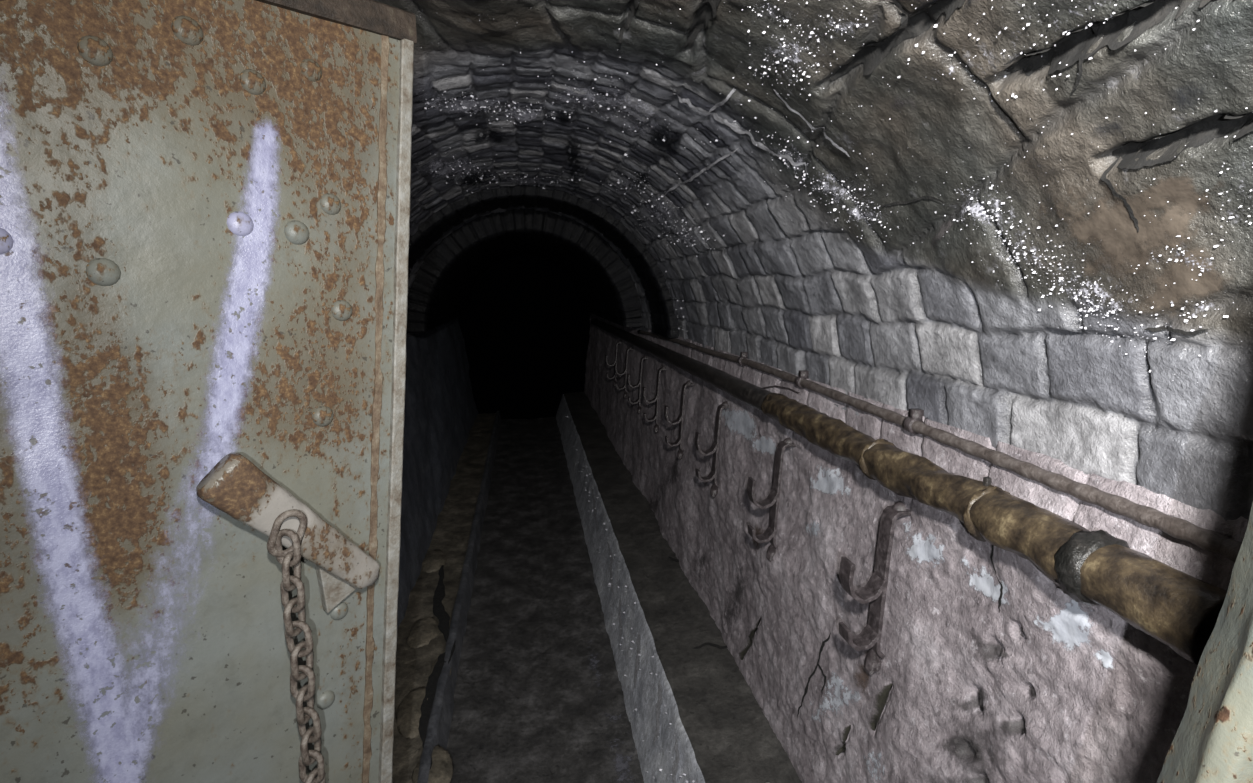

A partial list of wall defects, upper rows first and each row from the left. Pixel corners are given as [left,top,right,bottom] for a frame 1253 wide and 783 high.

leakage [742,0,874,99]
leakage [749,117,899,242]
leakage [943,177,1209,372]
leakage [1147,189,1252,281]
crack [694,642,728,650]
crack [797,632,831,719]